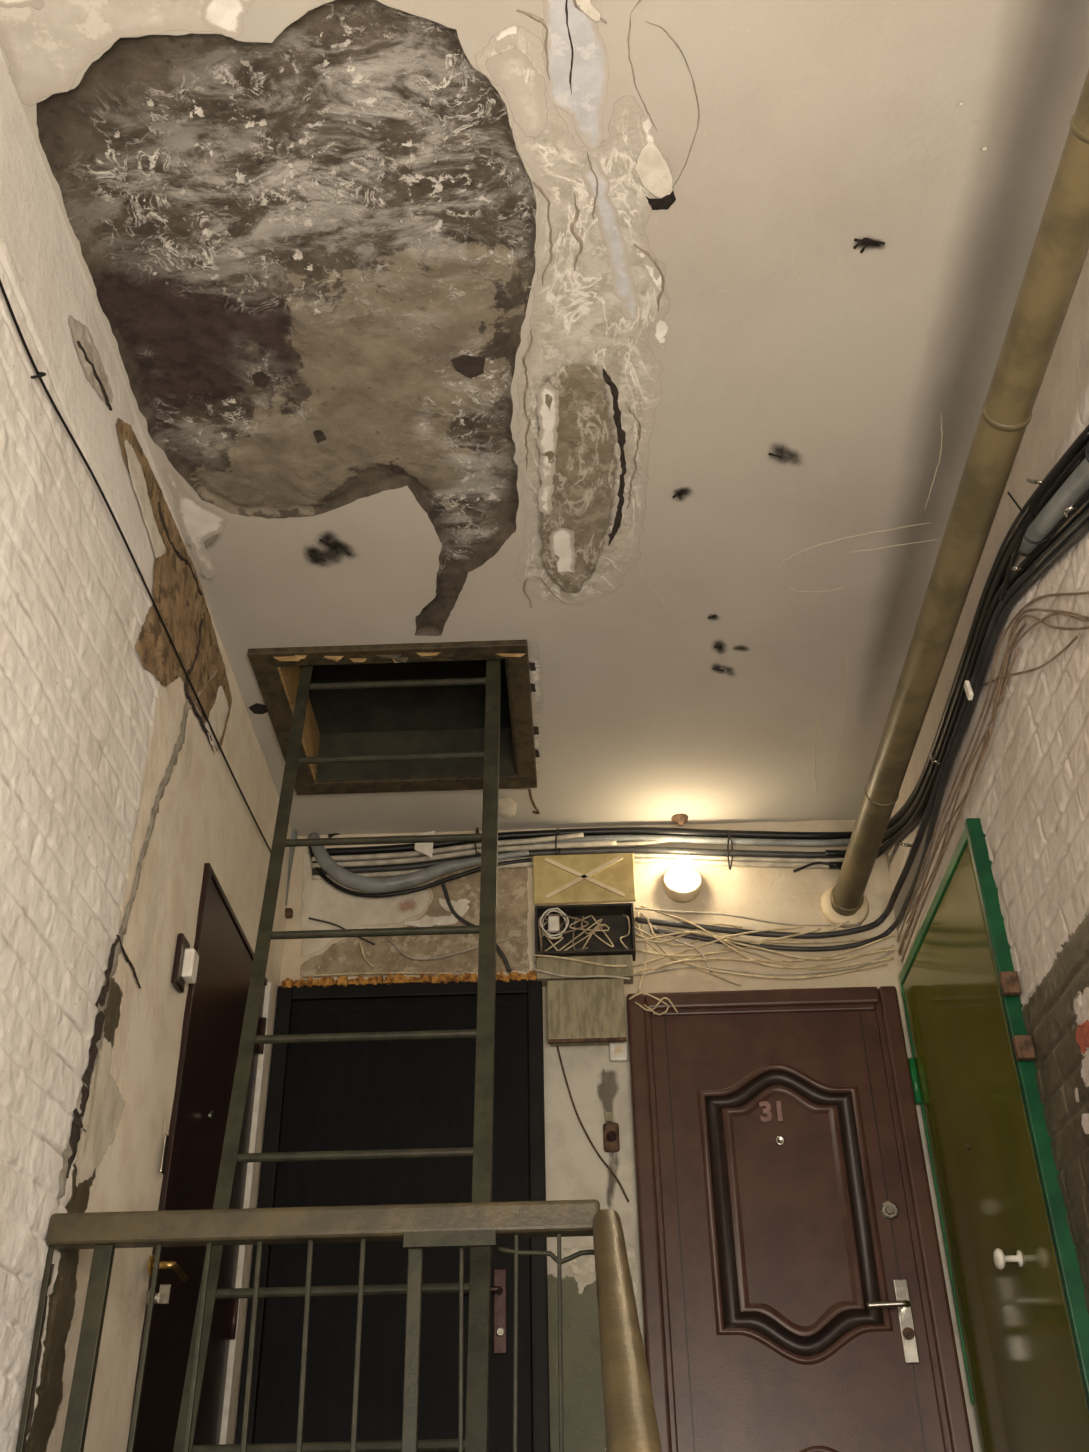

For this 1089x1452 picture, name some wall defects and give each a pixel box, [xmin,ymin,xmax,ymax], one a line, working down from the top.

crack [627,0,700,190]
spalling [0,0,676,754]
peeling [1073,987,1089,1134]